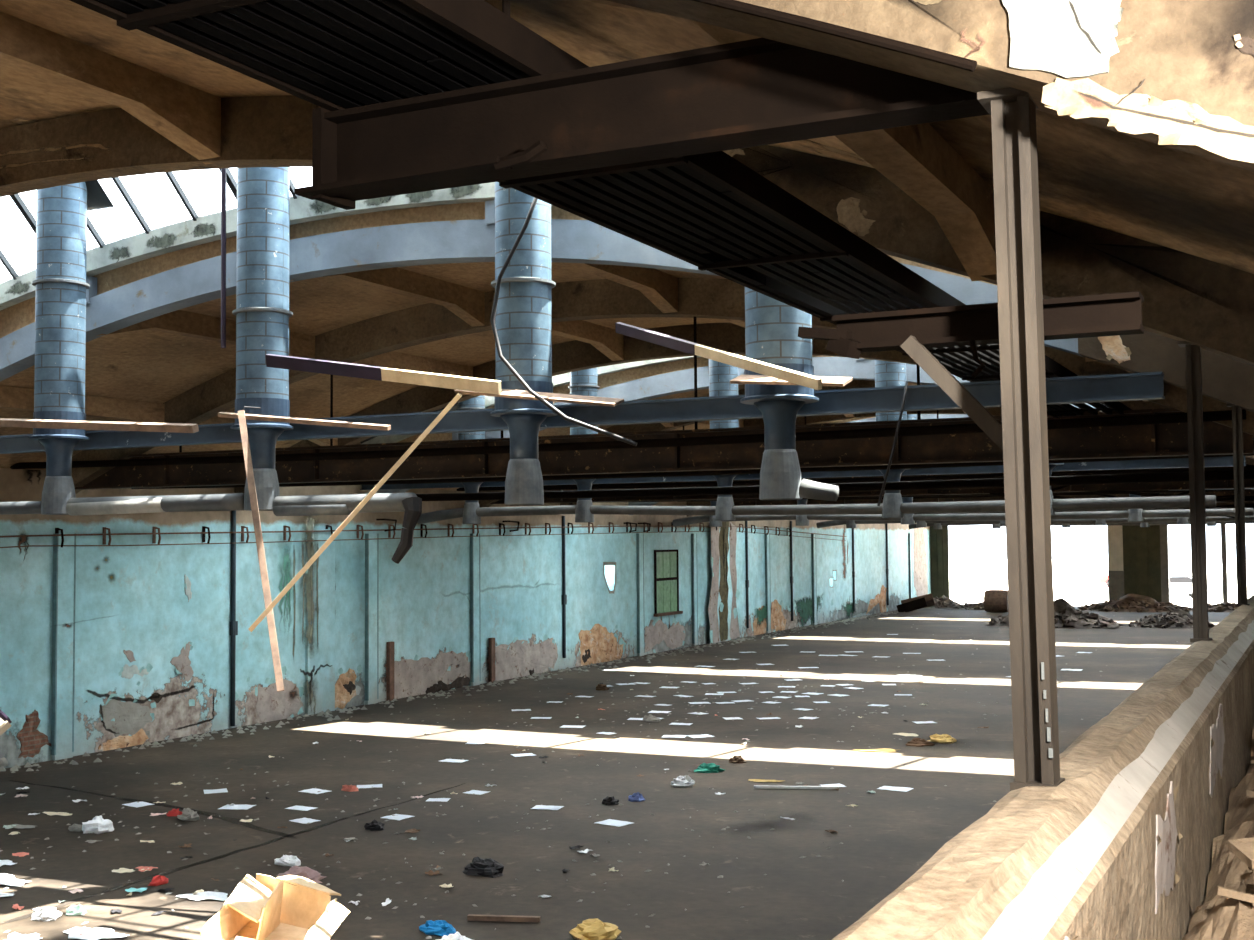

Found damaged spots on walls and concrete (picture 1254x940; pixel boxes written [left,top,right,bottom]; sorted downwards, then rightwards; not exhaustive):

crack [1069,1,1102,54]
peeling [1107,7,1123,57]
spalling [1042,78,1254,163]
crack [1079,79,1254,137]
spalling [837,197,875,236]
spalling [1098,335,1131,364]
damp [279,516,318,658]
peeling [378,521,802,701]
crack [87,685,215,734]
peeling [77,642,304,754]
spalling [335,668,361,709]
spalling [0,710,52,768]